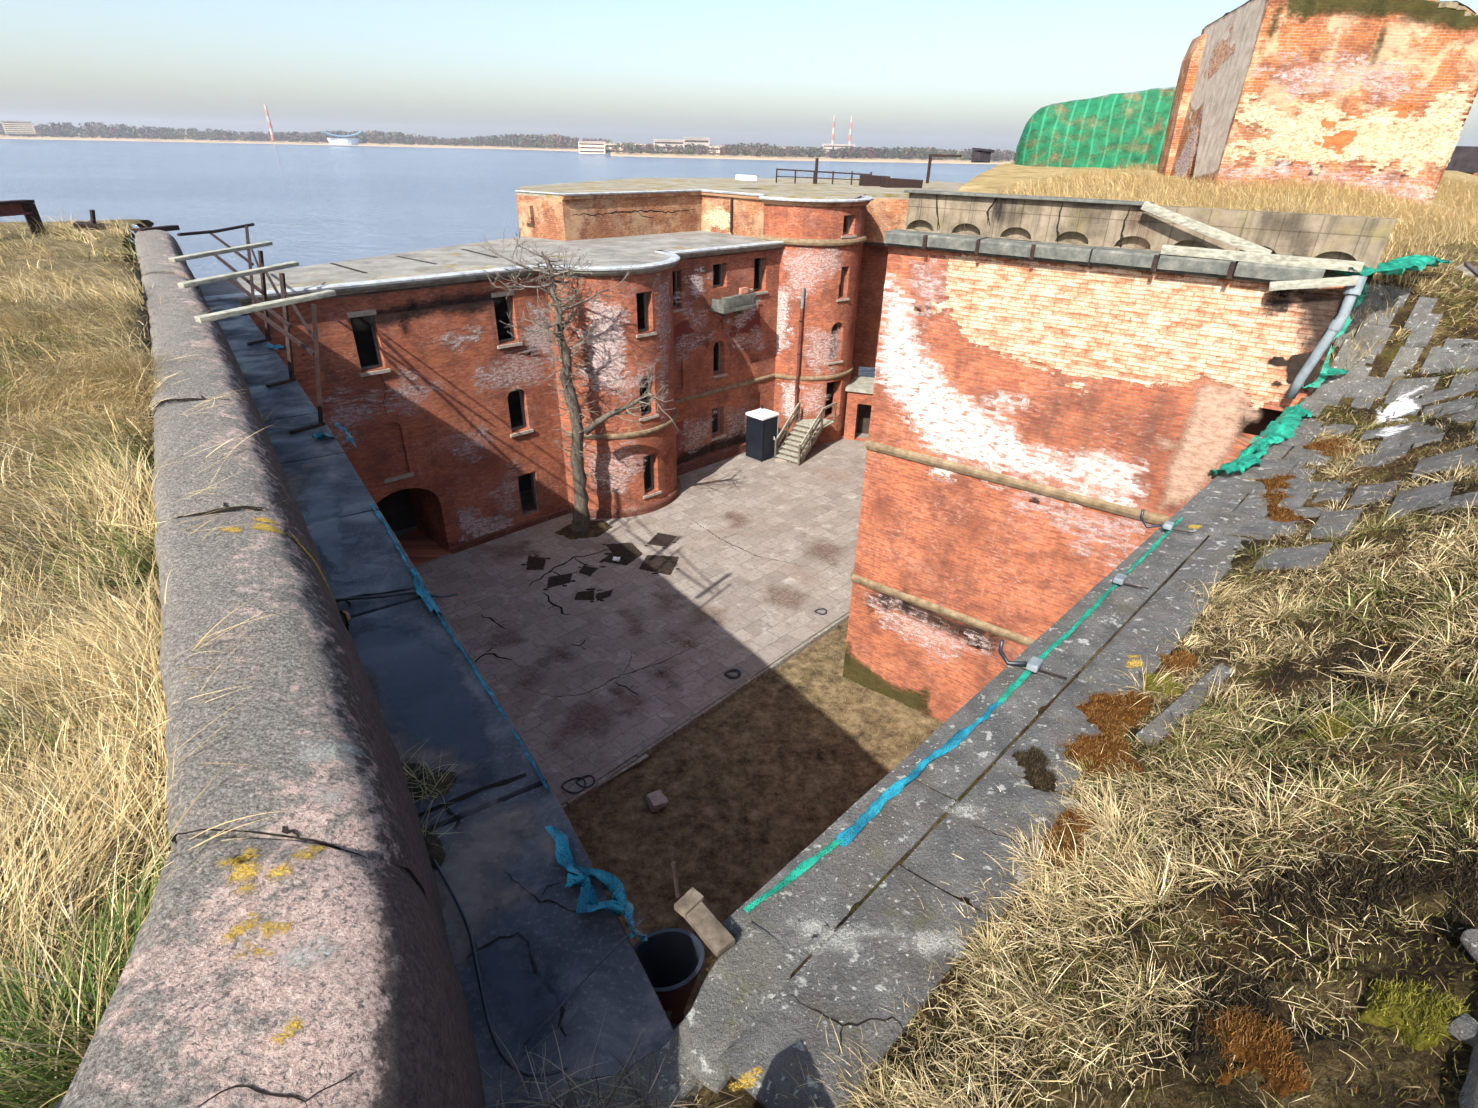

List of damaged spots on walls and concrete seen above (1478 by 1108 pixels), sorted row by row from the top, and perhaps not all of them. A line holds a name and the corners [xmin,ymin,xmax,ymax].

spalling [1204,7,1240,79]
spalling [1314,118,1358,154]
peeling [1371,163,1424,178]
spalling [1384,102,1419,125]
water stain [352,291,500,330]
spalling [931,250,1343,421]
water stain [1265,289,1343,365]
water stain [875,264,1148,567]
crack [529,549,609,650]
crack [474,614,707,697]
crack [170,826,367,858]
crack [196,1072,355,1108]